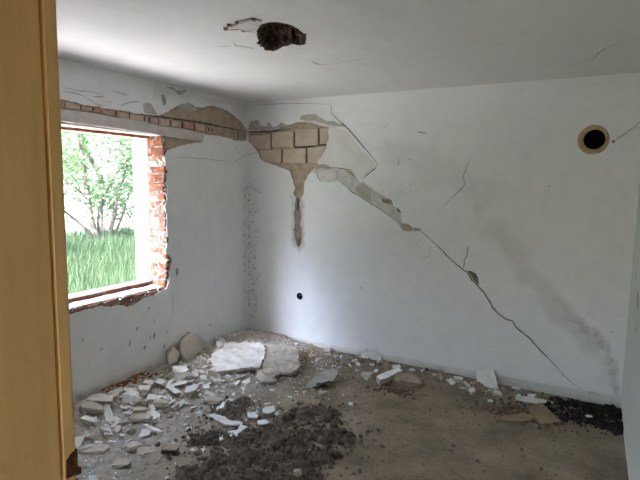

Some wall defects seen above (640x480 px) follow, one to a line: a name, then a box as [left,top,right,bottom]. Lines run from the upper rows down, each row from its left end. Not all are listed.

peeling [222,18,262,32]
flaking render [60,94,421,246]
crack [421,231,589,391]